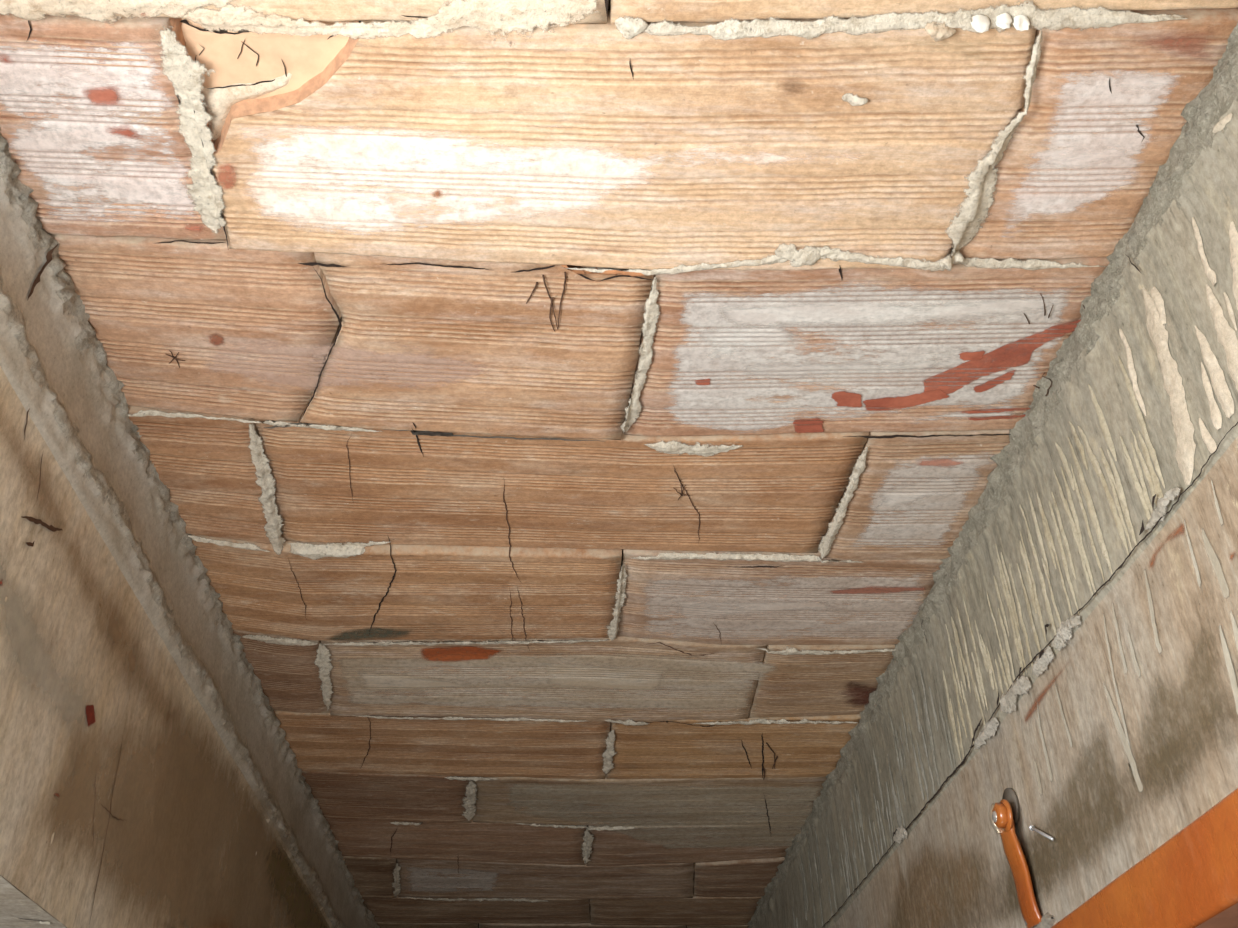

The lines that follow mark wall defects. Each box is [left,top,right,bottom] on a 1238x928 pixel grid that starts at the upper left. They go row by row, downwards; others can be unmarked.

spalling [169,17,361,189]
efflorescence [242,126,662,234]
efflorescence [1008,72,1179,228]
crack [27,244,59,301]
crack [264,263,347,429]
crack [394,423,599,457]
crack [387,262,652,282]
efflorescence [666,283,1066,431]
water stain [1142,217,1238,485]
water stain [508,328,1167,928]
crack [822,422,1238,928]
water stain [1184,520,1238,714]